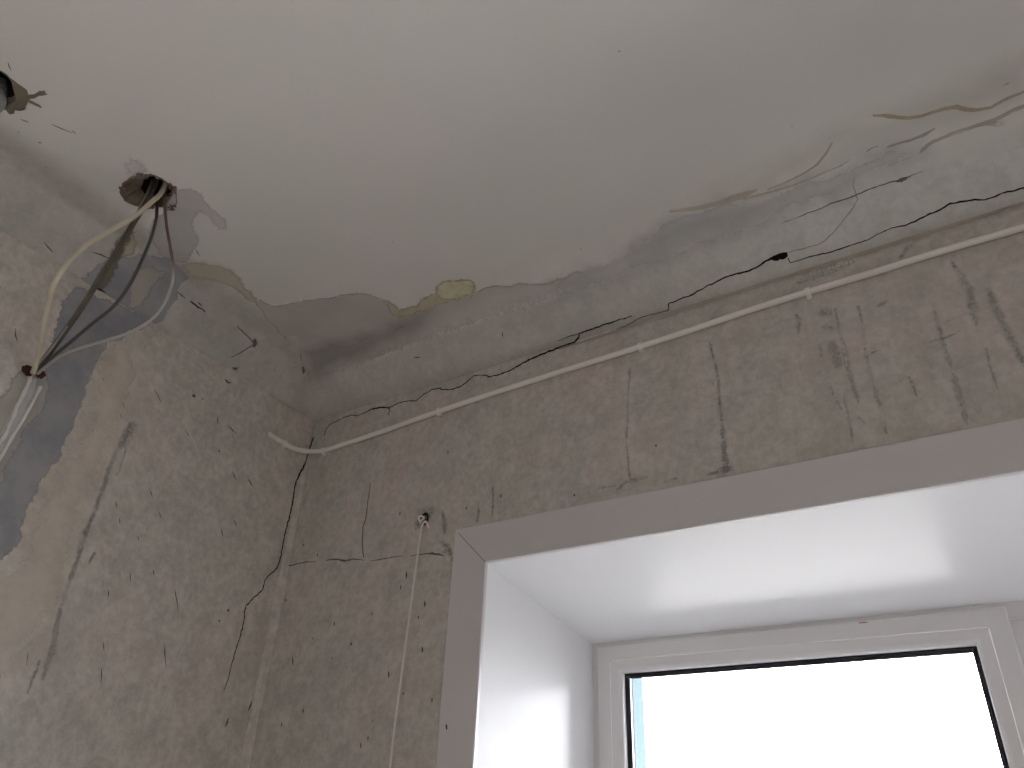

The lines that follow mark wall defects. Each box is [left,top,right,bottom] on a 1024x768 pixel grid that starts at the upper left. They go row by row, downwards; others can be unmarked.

spalling [0,72,15,98]
damp [867,91,1024,153]
spalling [141,173,172,196]
flaking render [253,272,588,378]
crack [224,162,1024,689]